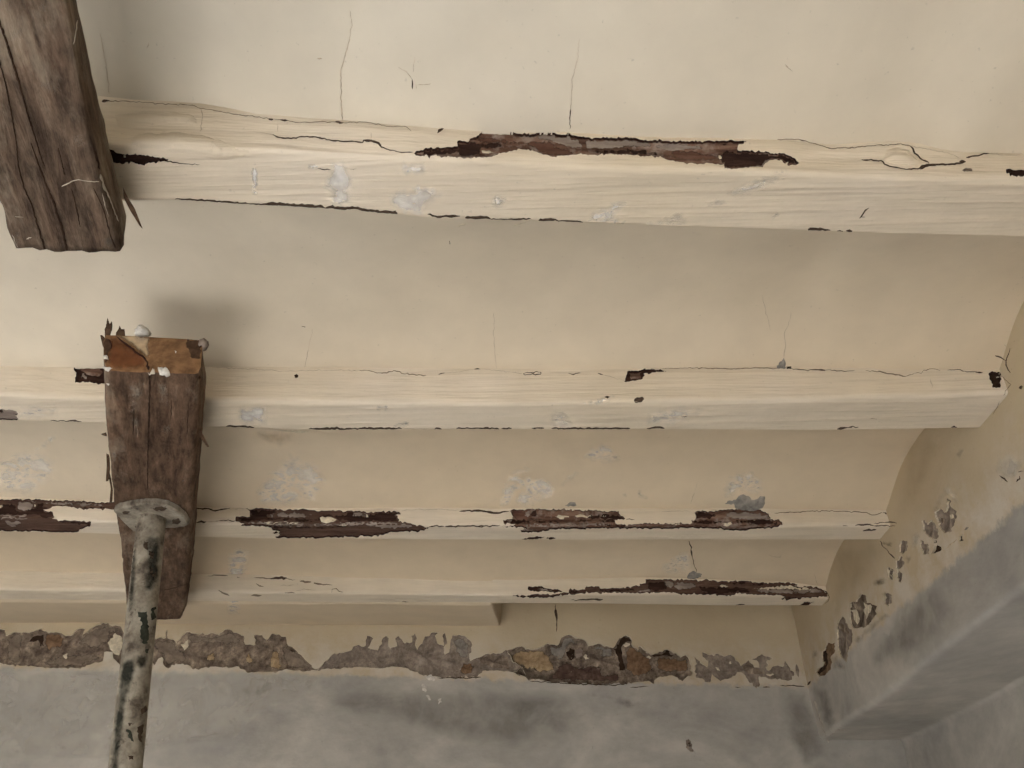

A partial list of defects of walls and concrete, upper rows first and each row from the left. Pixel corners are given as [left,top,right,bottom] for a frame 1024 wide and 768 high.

crack [100,12,412,153]
peeling [110,150,168,166]
peeling [414,132,799,169]
crack [777,139,1017,170]
peeling [624,368,664,382]
peeling [0,499,115,533]
peeling [235,508,428,539]
peeling [503,508,782,540]
spalling [887,498,963,583]
peeling [513,579,827,605]
spalling [816,593,892,677]
spalling [471,634,693,677]